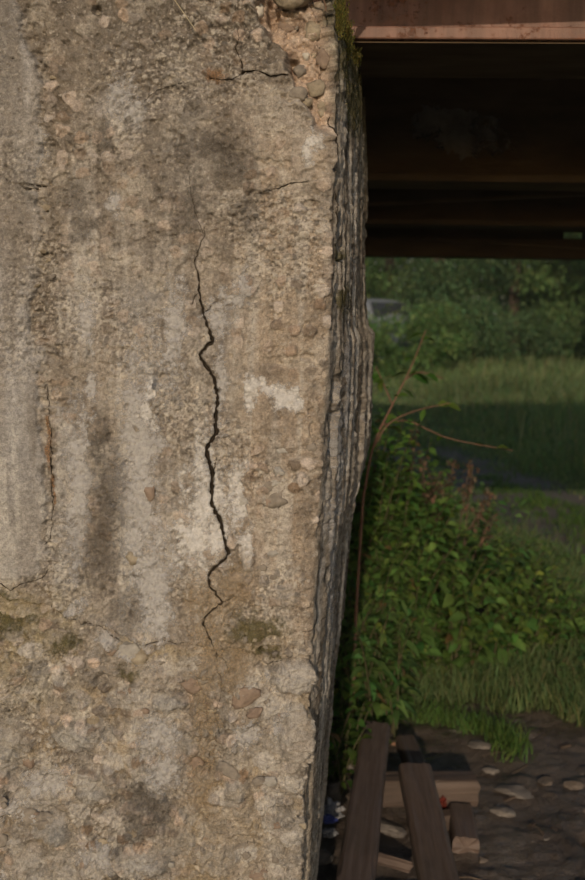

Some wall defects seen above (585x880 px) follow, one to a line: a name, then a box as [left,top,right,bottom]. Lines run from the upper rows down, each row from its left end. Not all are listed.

crack [210,29,288,80]
crack [44,387,54,545]
crack [189,176,238,734]